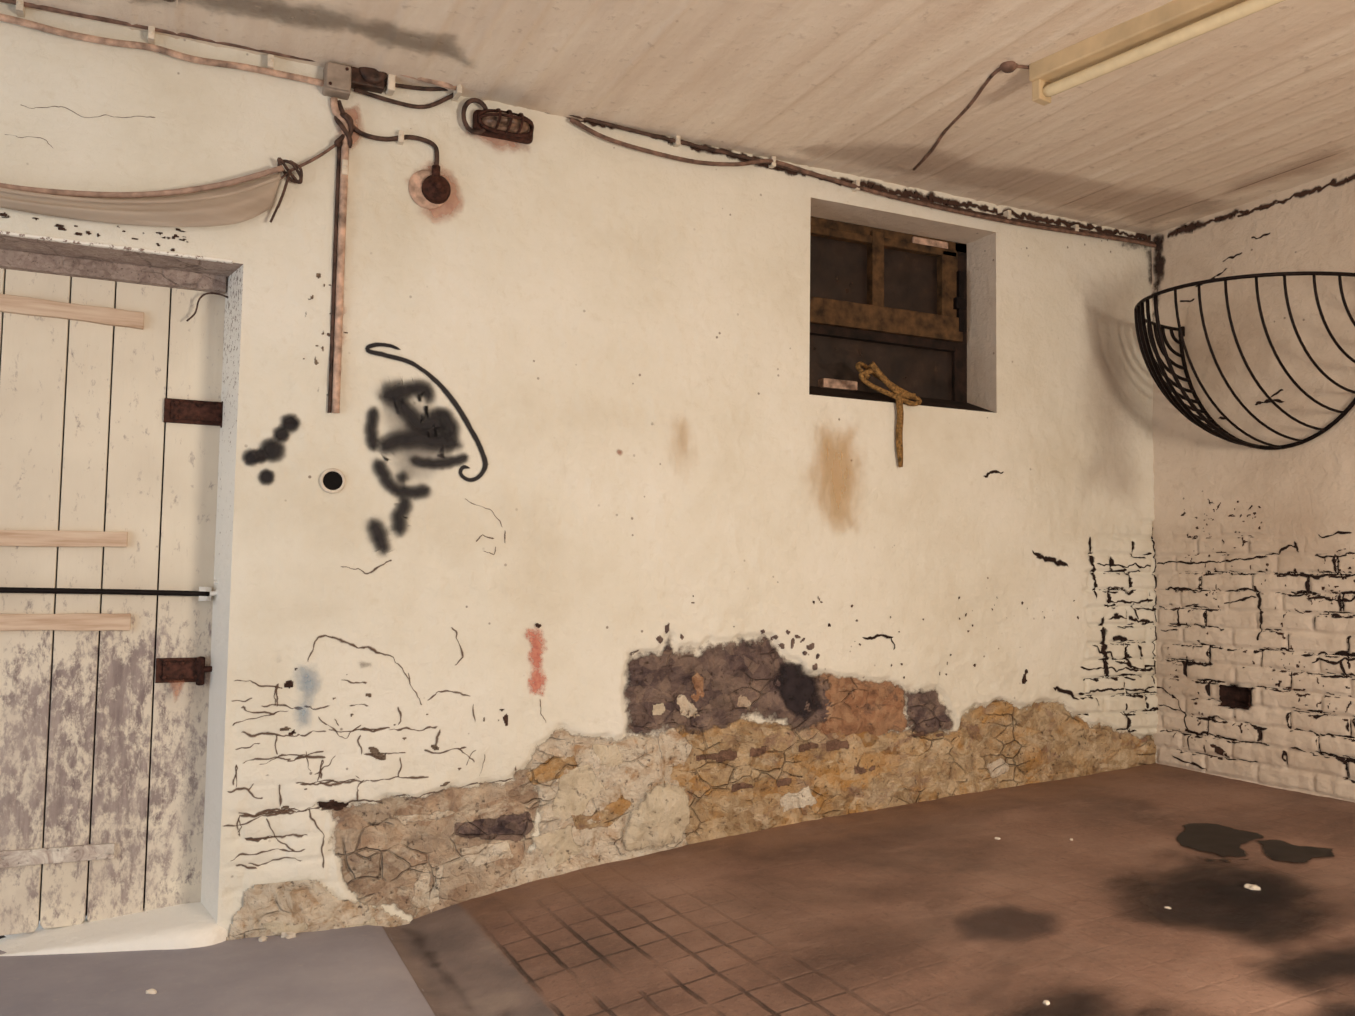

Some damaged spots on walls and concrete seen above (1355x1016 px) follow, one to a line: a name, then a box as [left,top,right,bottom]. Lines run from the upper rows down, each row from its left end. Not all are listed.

rust [429,167,459,218]
crack [224,627,516,869]
flaking render [317,624,1156,919]
water stain [1128,823,1334,941]
water stain [964,910,1046,936]
water stain [1272,949,1355,988]
water stain [1019,993,1106,1016]
water stain [1324,1005,1355,1016]